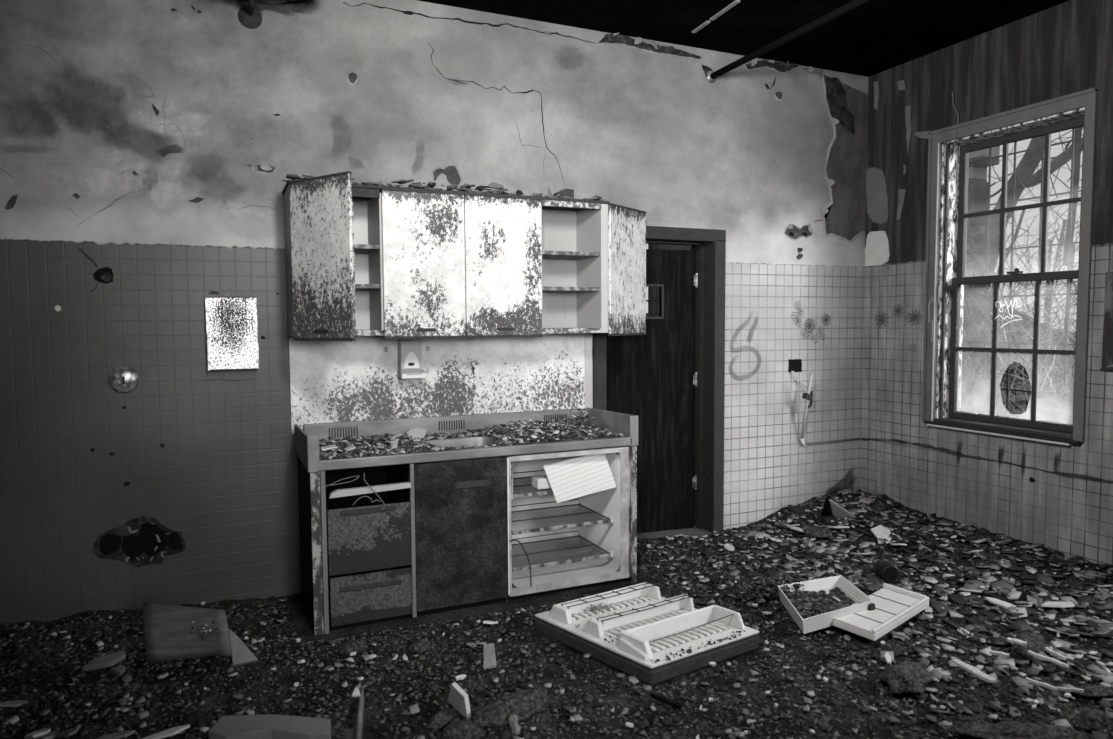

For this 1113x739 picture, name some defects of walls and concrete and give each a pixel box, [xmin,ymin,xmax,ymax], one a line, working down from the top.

crack [343,2,605,44]
spalling [597,33,713,74]
leakage [84,102,200,209]
crack [430,45,564,182]
peeling [744,59,906,266]
peeling [903,105,931,174]
hole [93,516,186,567]